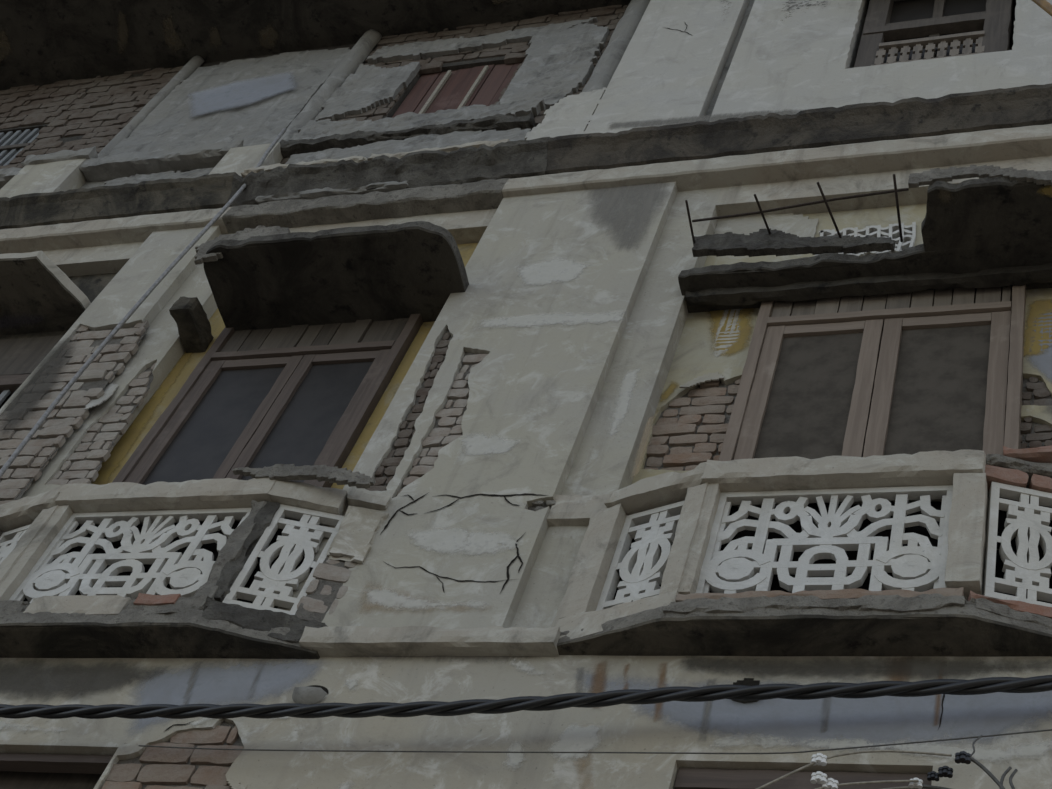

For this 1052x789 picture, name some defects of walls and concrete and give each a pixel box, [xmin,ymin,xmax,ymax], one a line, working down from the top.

peeling [714,309,740,356]
flaking render [0,320,156,505]
flaking render [366,330,488,495]
flaking render [644,371,741,471]
flaking render [1020,313,1052,449]
crack [380,493,546,535]
flaking render [985,465,1052,502]
crack [383,534,524,593]
flaking render [101,722,248,789]